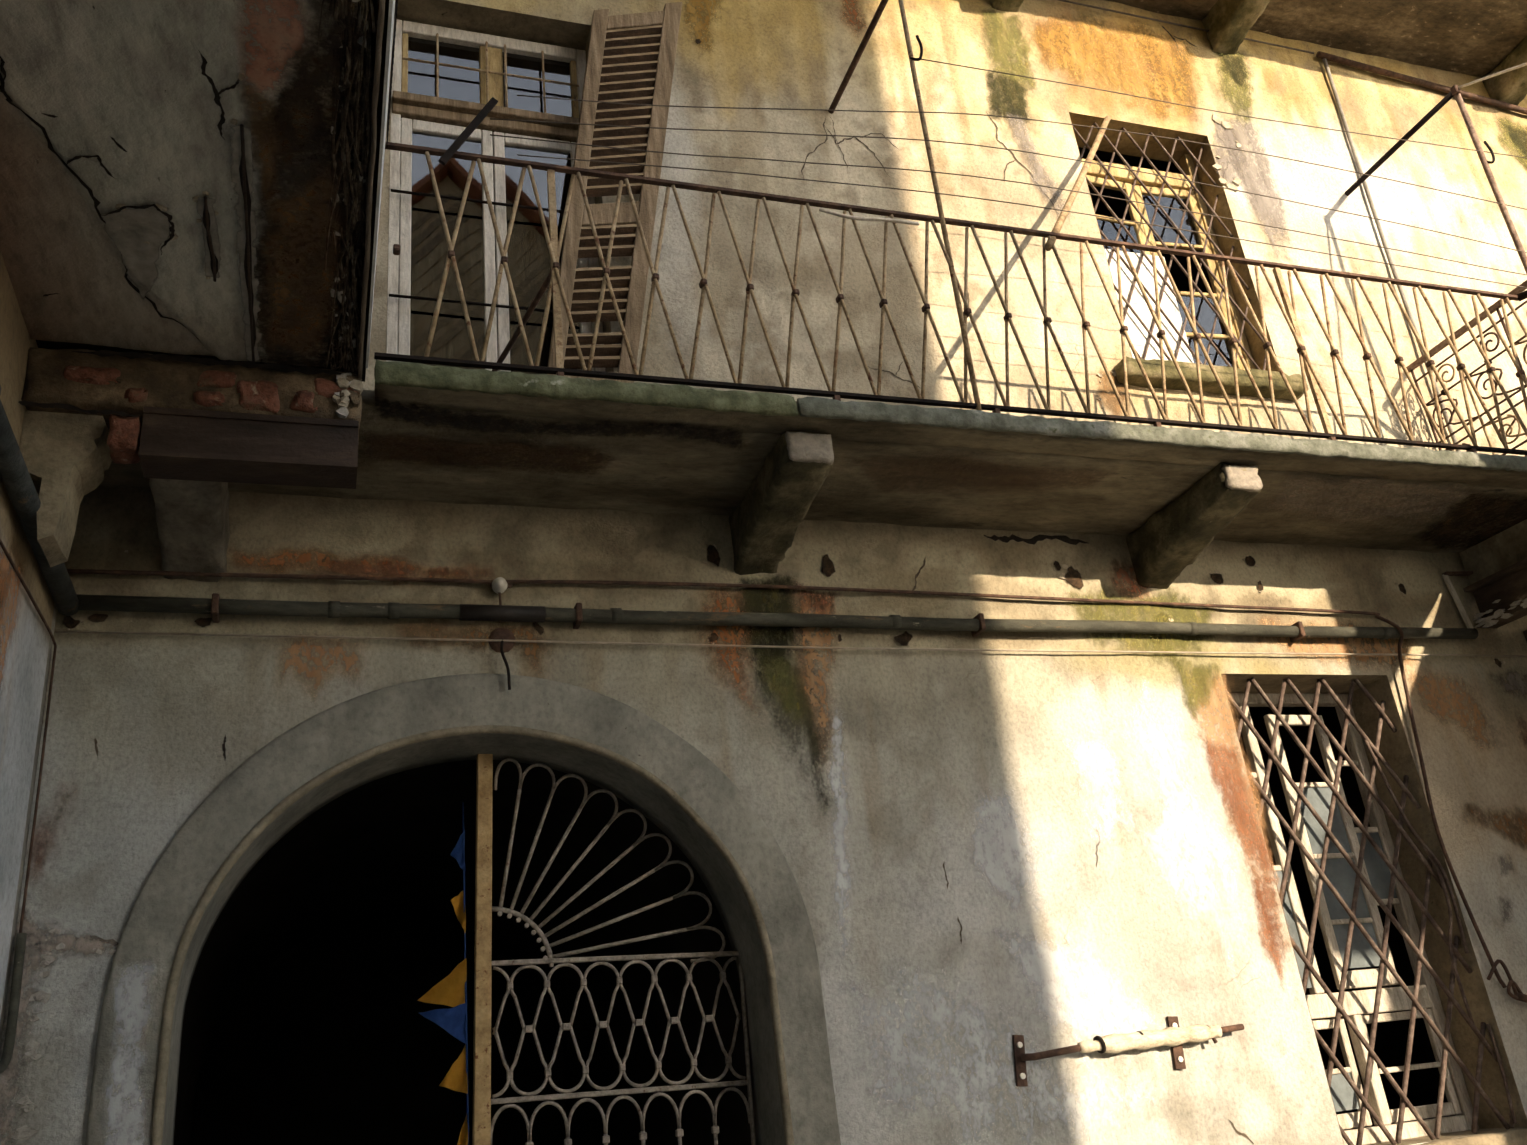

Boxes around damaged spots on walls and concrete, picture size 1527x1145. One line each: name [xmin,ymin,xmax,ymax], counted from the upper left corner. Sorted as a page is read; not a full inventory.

damp [242,0,361,372]
crack [801,117,898,178]
damp [982,9,1065,209]
damp [1498,118,1527,168]
flaking render [107,414,141,464]
corrosion [0,551,22,687]
crack [984,534,1088,545]
hole [1051,560,1084,589]
damp [736,578,851,921]
corrosion [1173,661,1282,975]